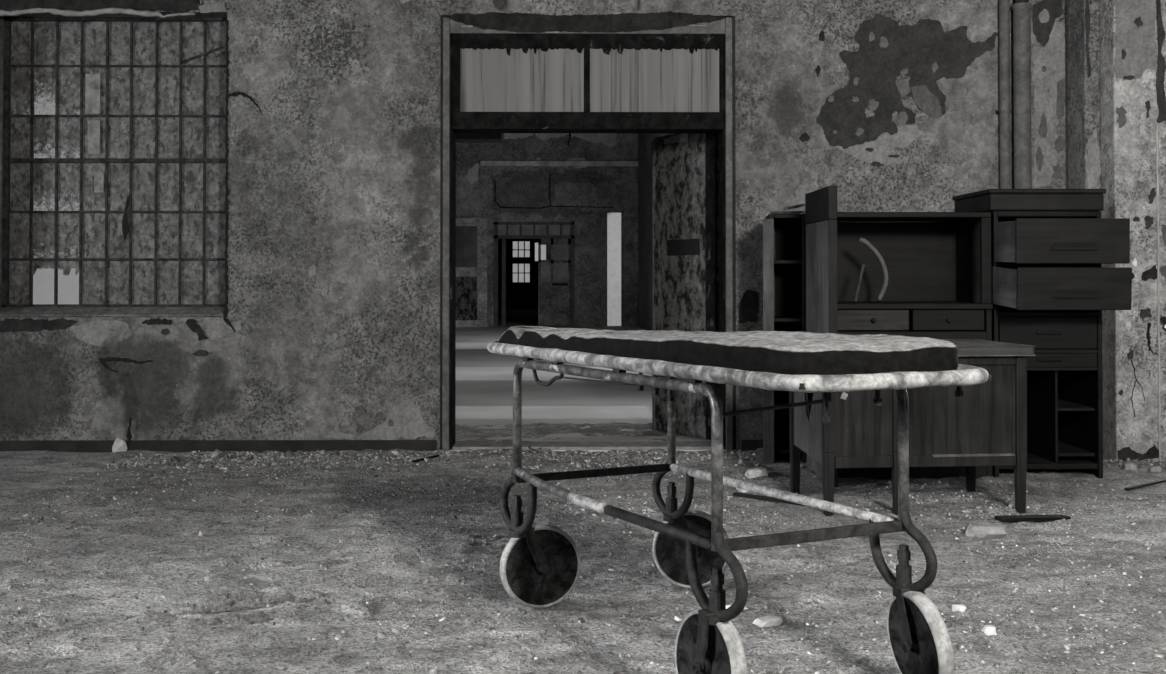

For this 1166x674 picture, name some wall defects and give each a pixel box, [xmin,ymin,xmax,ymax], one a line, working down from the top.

peeling [1113,0,1166,123]
peeling [816,14,998,168]
peeling [1032,0,1066,188]
peeling [1116,106,1127,128]
peeling [1133,188,1166,246]
flaking render [1132,258,1166,281]
peeling [0,318,172,352]
peeling [186,319,242,356]
peeling [1140,308,1166,331]
leakage [97,341,182,433]
crack [1131,323,1158,417]
flaking render [1117,444,1159,461]